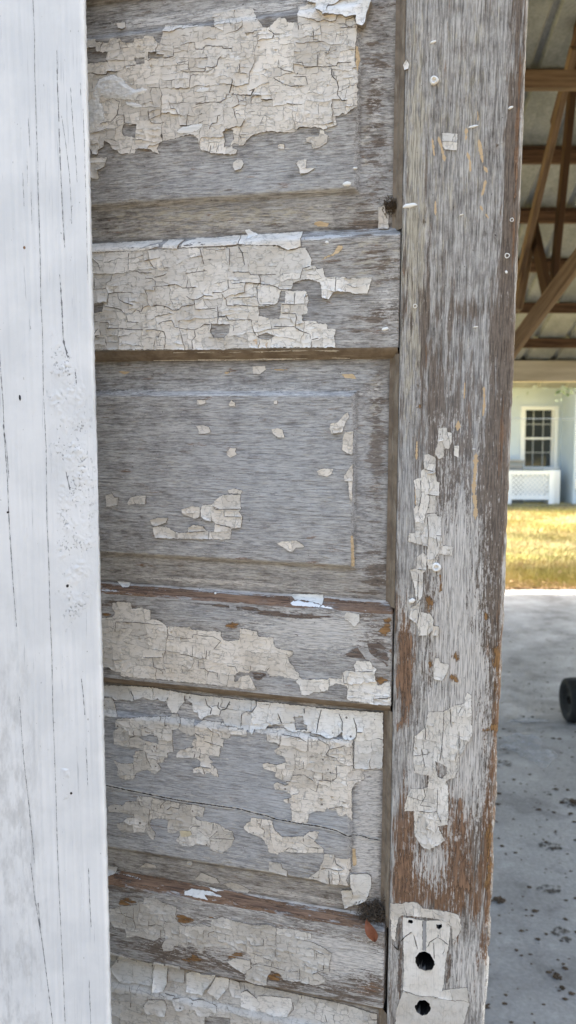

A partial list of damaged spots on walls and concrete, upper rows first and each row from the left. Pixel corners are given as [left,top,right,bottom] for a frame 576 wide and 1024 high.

peeling [87,0,373,179]
peeling [92,232,372,374]
peeling [317,412,354,501]
peeling [102,428,498,1024]